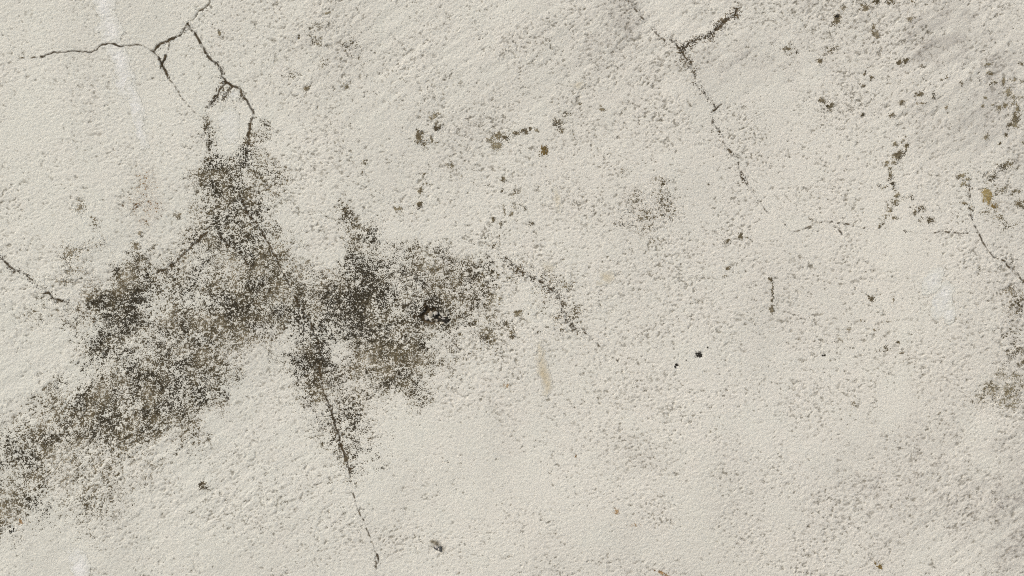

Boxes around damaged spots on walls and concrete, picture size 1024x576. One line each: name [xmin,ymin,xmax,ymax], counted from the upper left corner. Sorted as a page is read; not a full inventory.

crack [31,0,257,155]
mould [486,127,539,152]
damp [552,80,585,138]
crack [625,0,865,234]
crack [0,255,96,323]
crack [156,228,249,274]
damp [0,90,529,576]
crack [238,191,379,568]
damp [535,331,553,397]
crack [934,182,1024,283]